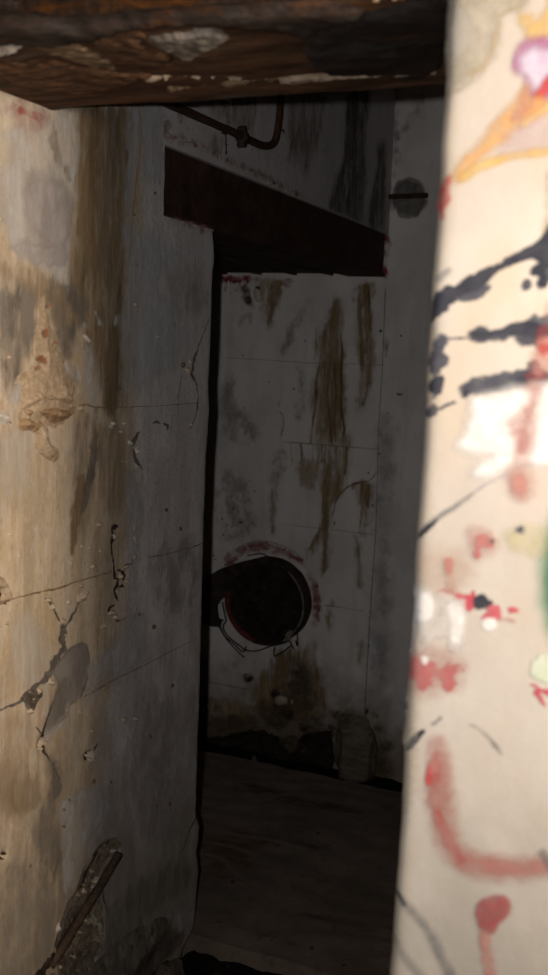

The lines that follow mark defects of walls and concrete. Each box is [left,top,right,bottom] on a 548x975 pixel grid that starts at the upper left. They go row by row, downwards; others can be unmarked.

water stain [0,100,161,555]
water stain [299,299,372,573]
water stain [357,283,382,405]
crack [0,522,137,780]
spalling [54,837,121,975]